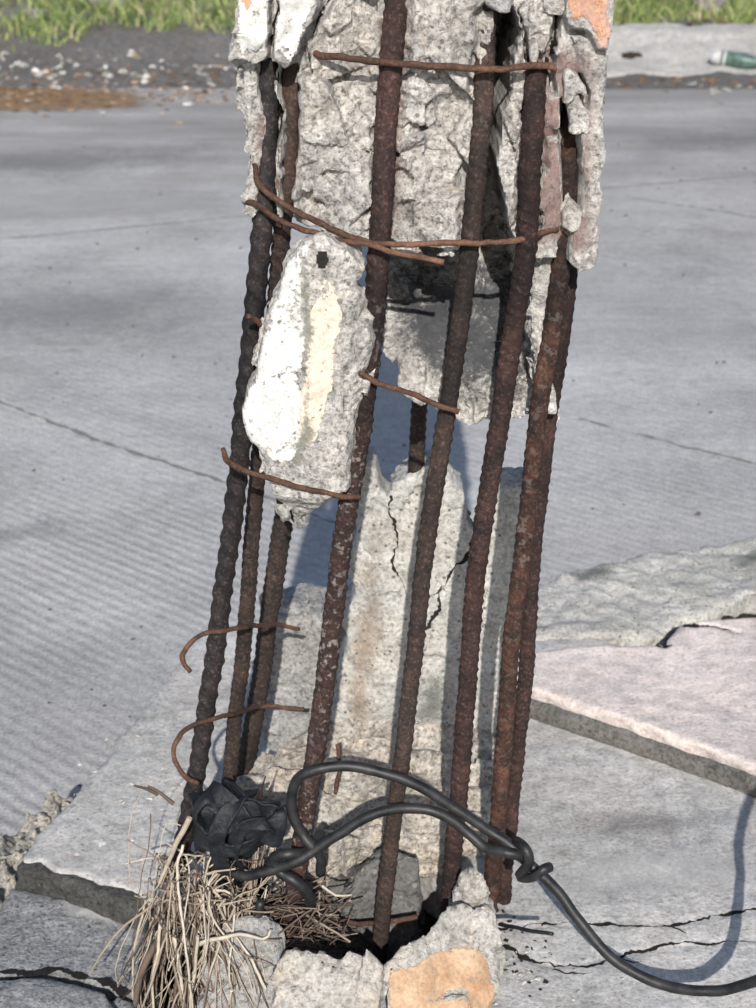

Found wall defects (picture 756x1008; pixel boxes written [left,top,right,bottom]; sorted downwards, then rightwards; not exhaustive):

corrosion [537,52,579,245]
spalling [168,0,610,1008]
crack [388,495,471,630]
spalling [0,789,177,945]
crack [0,967,132,1008]
spalling [150,945,171,1008]
crack [497,908,756,974]